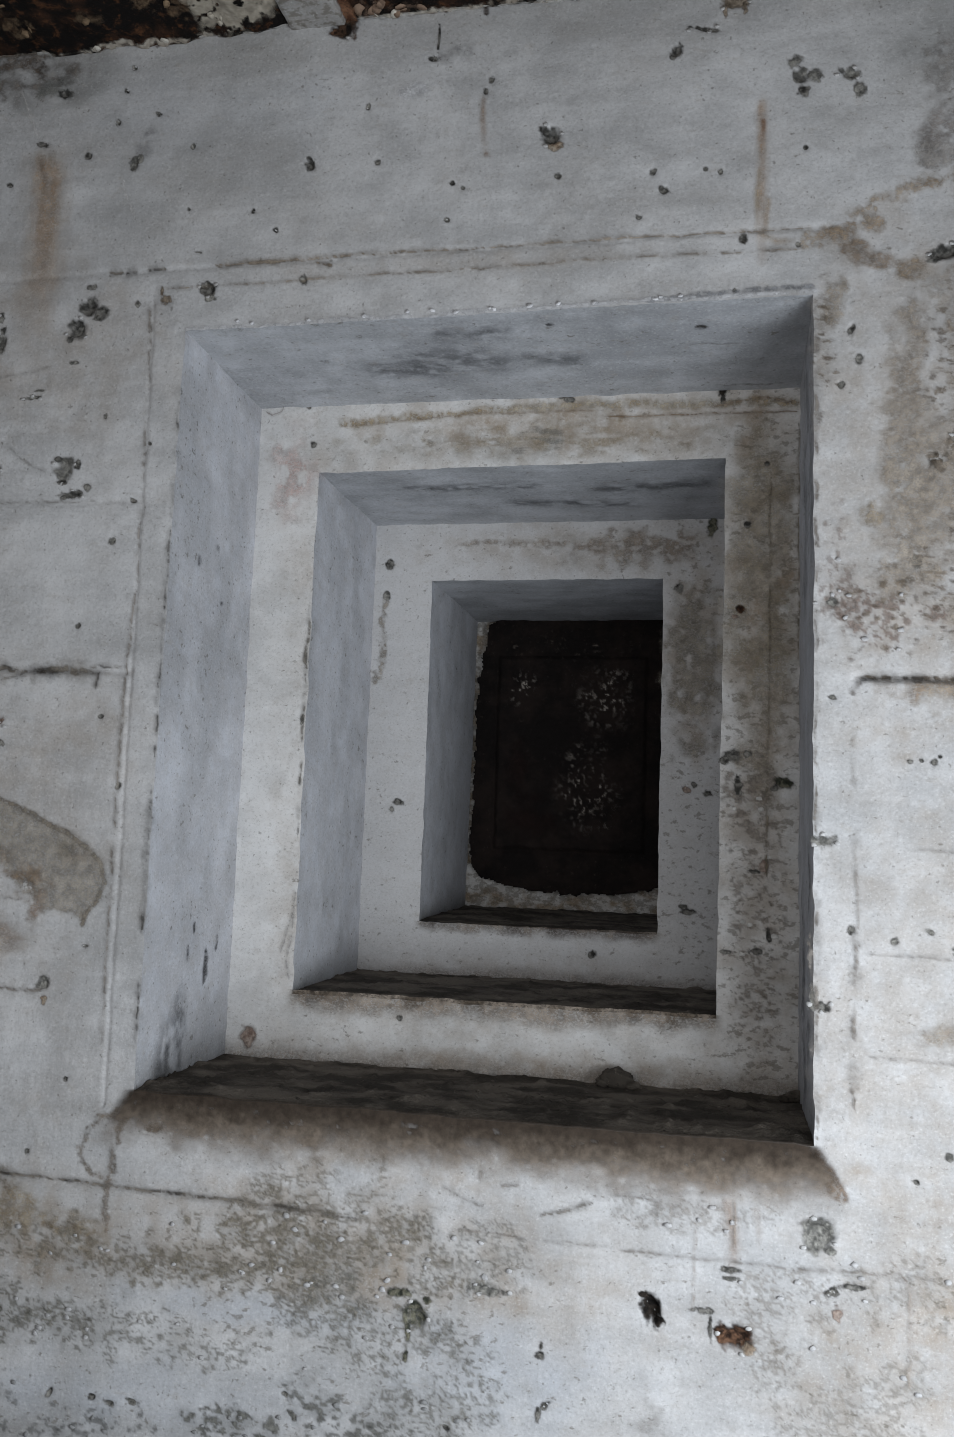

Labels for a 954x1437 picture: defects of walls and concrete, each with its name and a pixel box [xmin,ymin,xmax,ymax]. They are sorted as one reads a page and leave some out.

water stain [801,113,954,279]
water stain [813,281,848,381]
water stain [866,300,954,629]
crack [852,675,954,695]
water stain [0,798,107,926]
crack [808,912,856,1039]
water stain [0,1110,122,1253]
spalling [639,1291,666,1327]